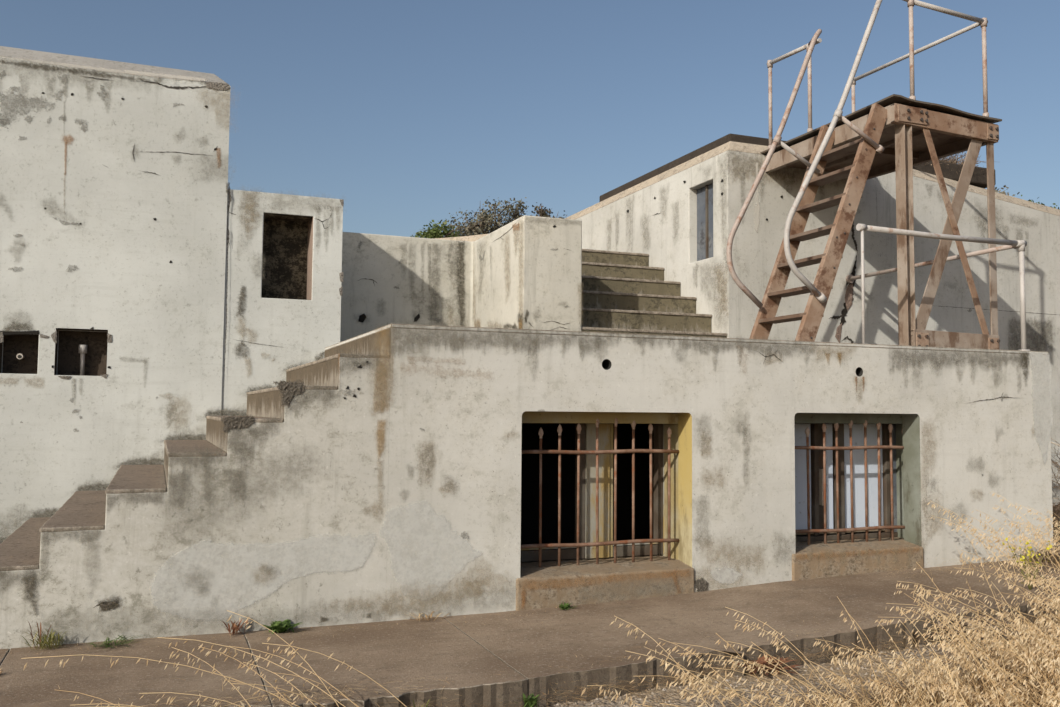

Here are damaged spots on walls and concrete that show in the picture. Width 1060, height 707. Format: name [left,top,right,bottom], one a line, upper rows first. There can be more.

peeling [0,70,87,132]
crack [176,146,279,371]
damp [393,243,612,349]
damp [893,323,1051,378]
damp [0,573,36,612]